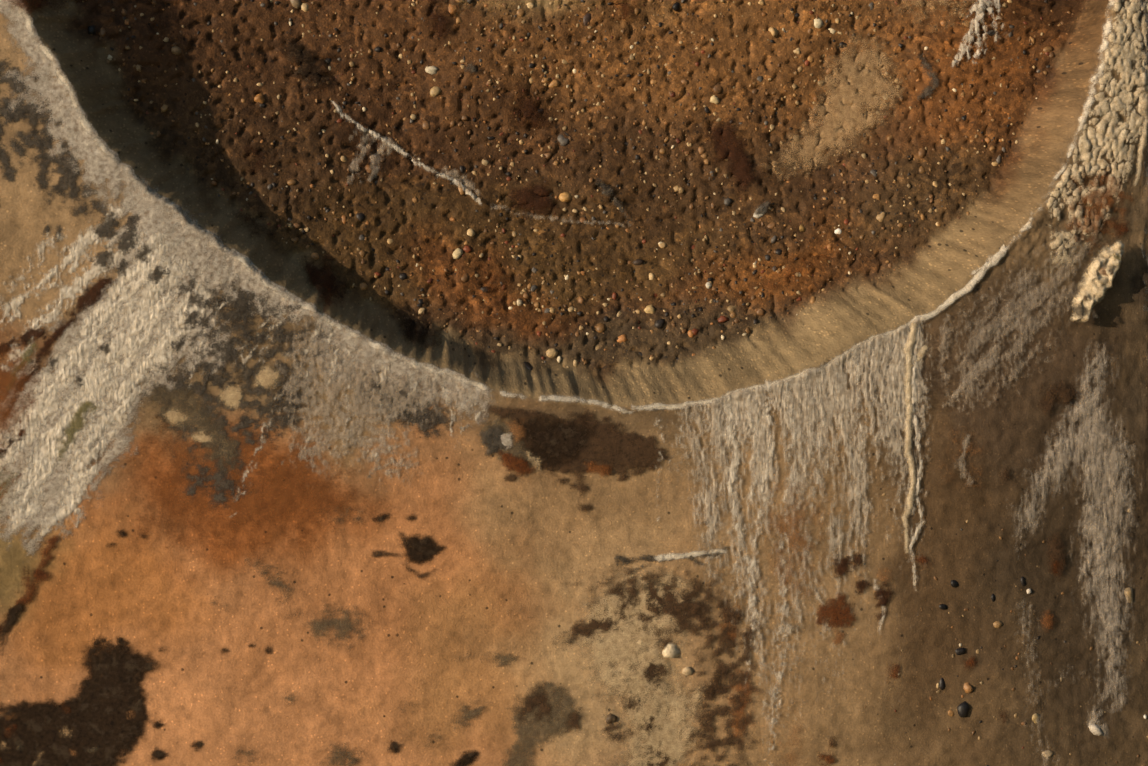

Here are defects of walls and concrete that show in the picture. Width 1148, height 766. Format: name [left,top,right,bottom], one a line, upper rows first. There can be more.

crack [464,62,478,73]
crack [917,54,939,101]
crack [331,101,631,224]
water stain [938,0,1148,405]
water stain [0,0,1009,683]
rust [154,423,344,543]
water stain [1025,353,1132,704]